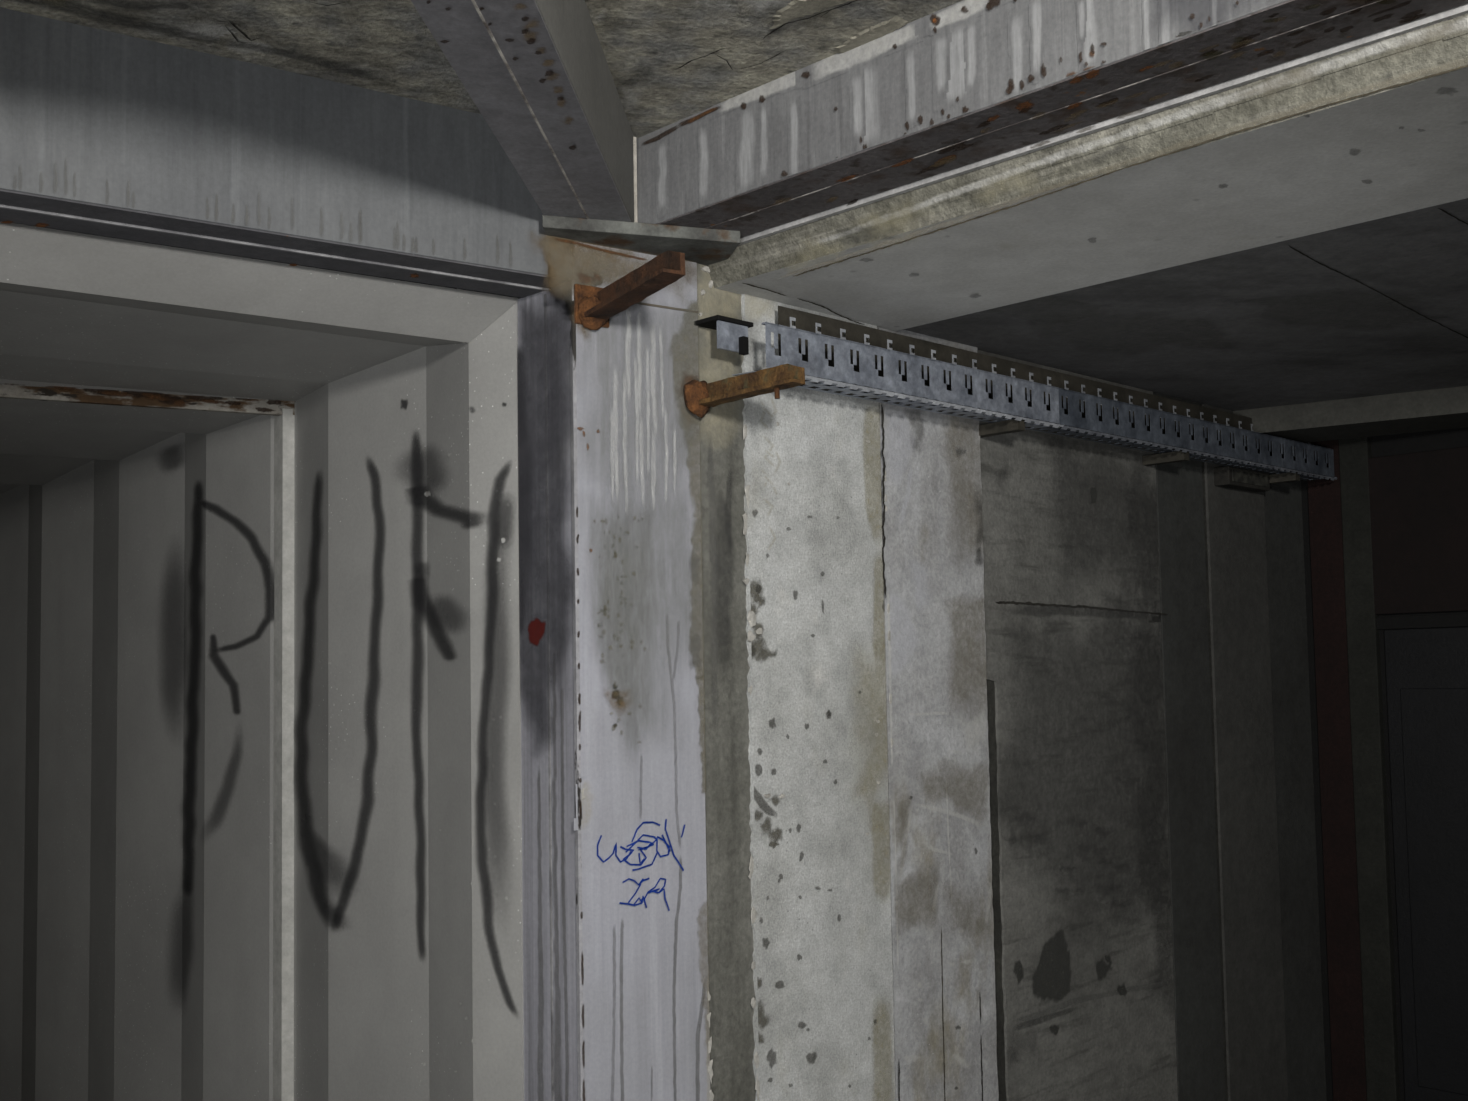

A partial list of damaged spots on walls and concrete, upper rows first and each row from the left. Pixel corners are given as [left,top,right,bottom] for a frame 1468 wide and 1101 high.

damp [102,0,351,72]
rust [505,4,572,124]
rust [644,107,718,144]
crack [672,0,858,71]
rust [904,97,969,134]
rust [1006,42,1165,148]
rust [1199,0,1426,58]
rust [47,386,296,412]
damp [1014,930,1071,1035]